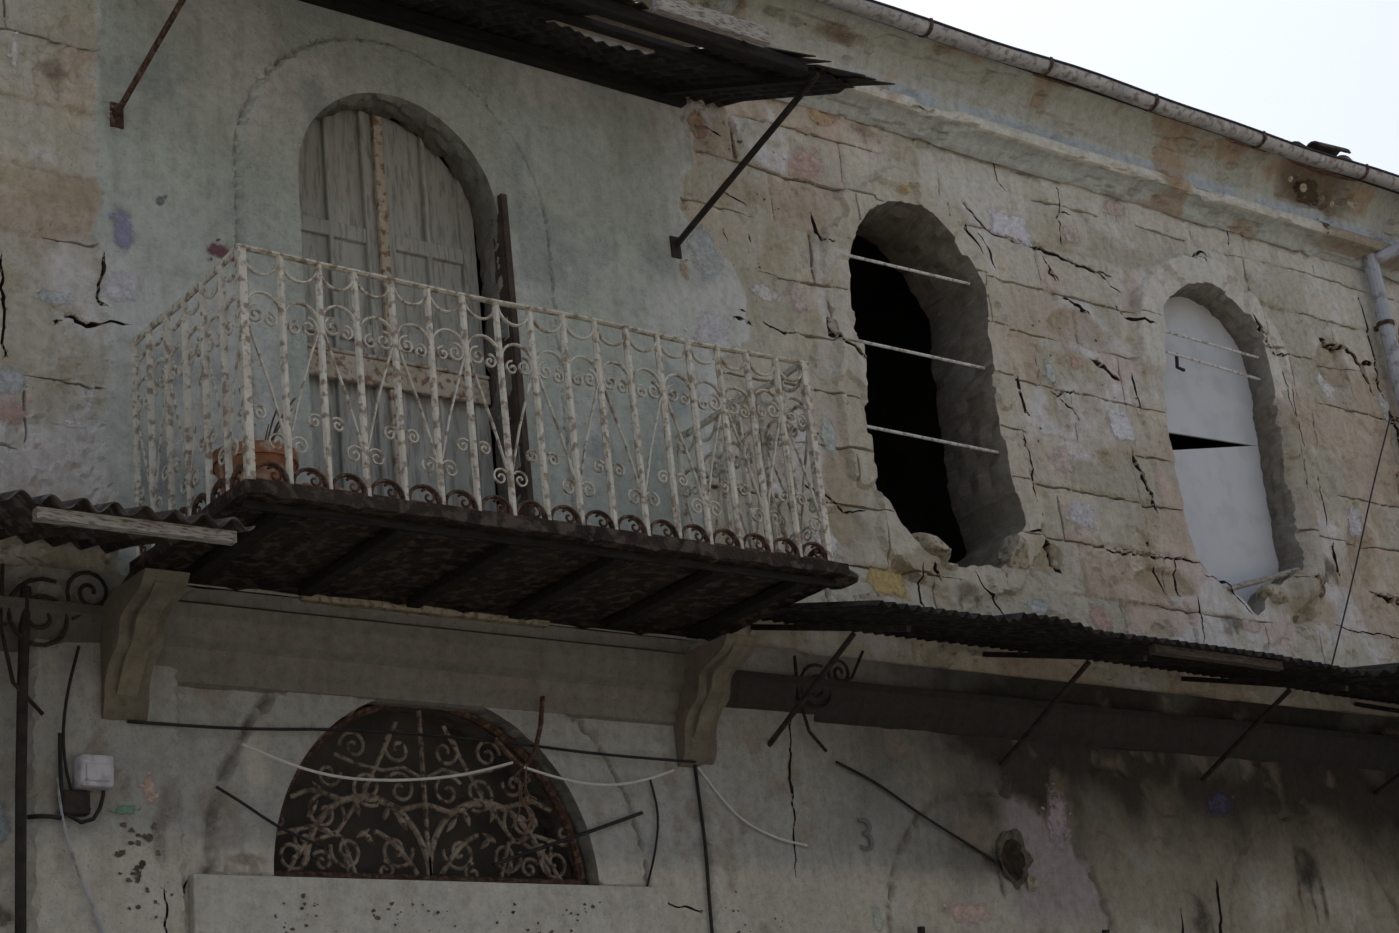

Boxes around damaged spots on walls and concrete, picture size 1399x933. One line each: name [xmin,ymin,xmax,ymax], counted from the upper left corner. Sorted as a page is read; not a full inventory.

crack [0,255,8,359]
crack [55,252,127,328]
crack [763,317,867,358]
crack [811,215,834,242]
crack [962,187,1155,323]
crack [1092,357,1141,409]
crack [1192,231,1229,262]
crack [1015,376,1079,574]
crack [1253,314,1340,576]
peeling [867,568,909,599]
crack [1104,455,1253,639]
crack [788,720,797,875]